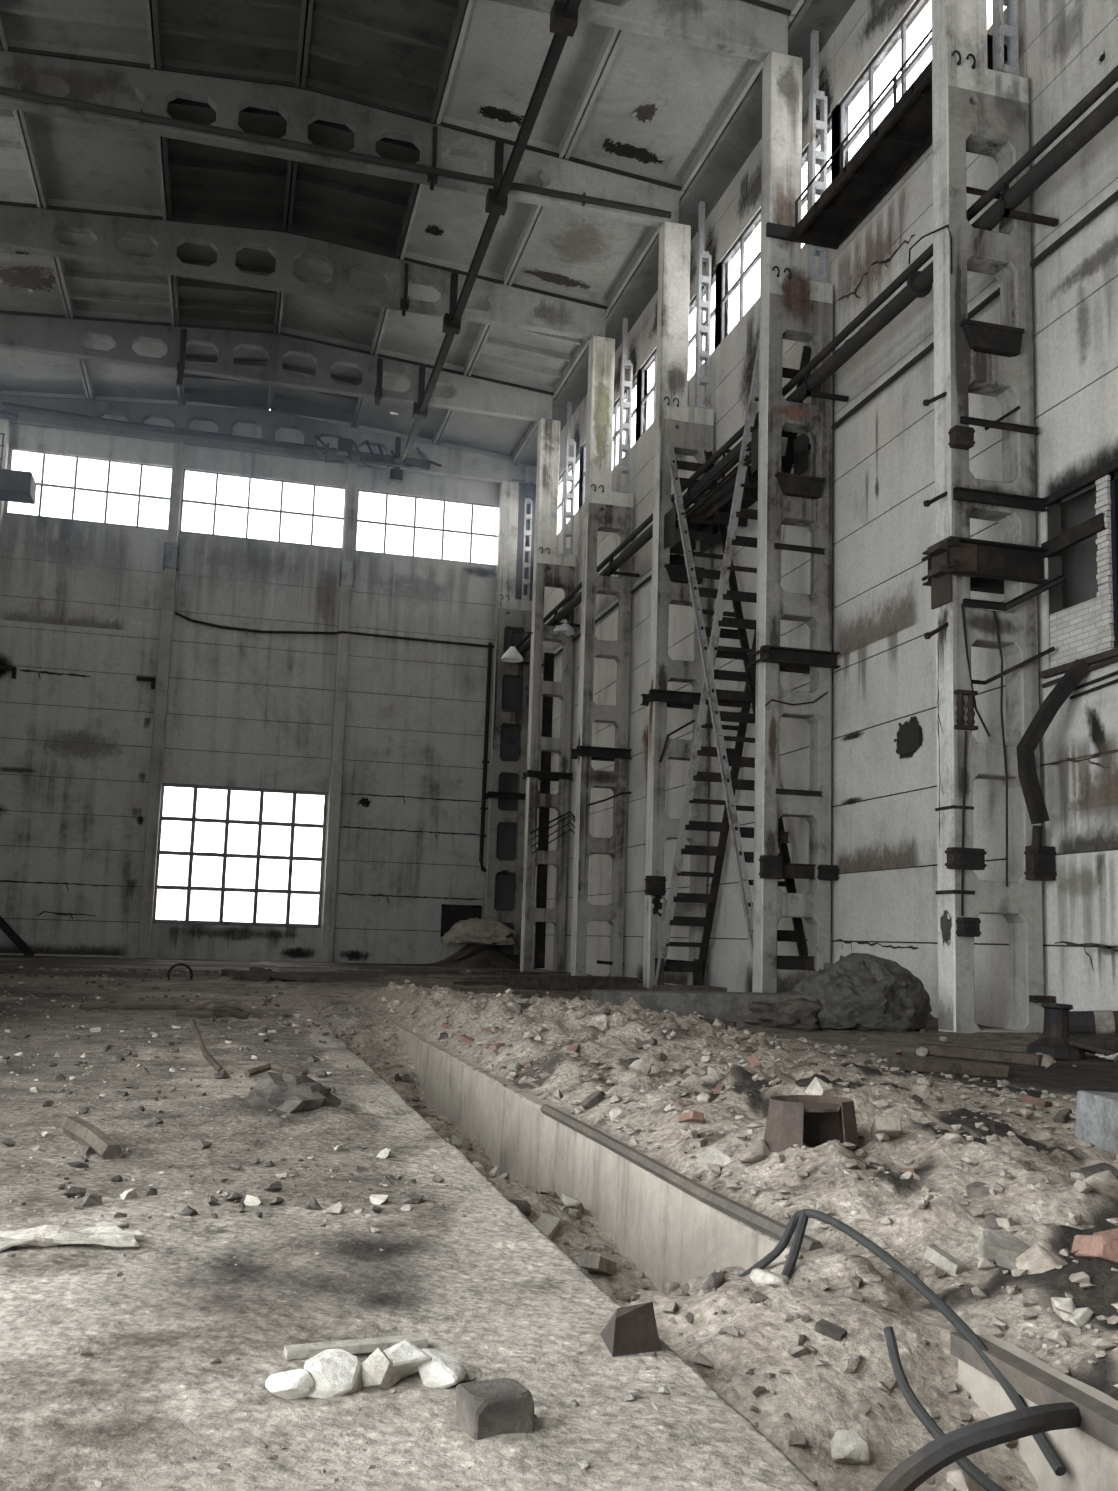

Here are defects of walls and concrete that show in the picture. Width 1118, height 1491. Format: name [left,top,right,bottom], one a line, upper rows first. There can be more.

peeling [477,106,524,127]
peeling [632,102,658,124]
peeling [598,138,667,164]
peeling [0,250,56,292]
damp [1048,446,1118,496]
damp [1060,749,1118,874]
crack [1055,941,1118,971]